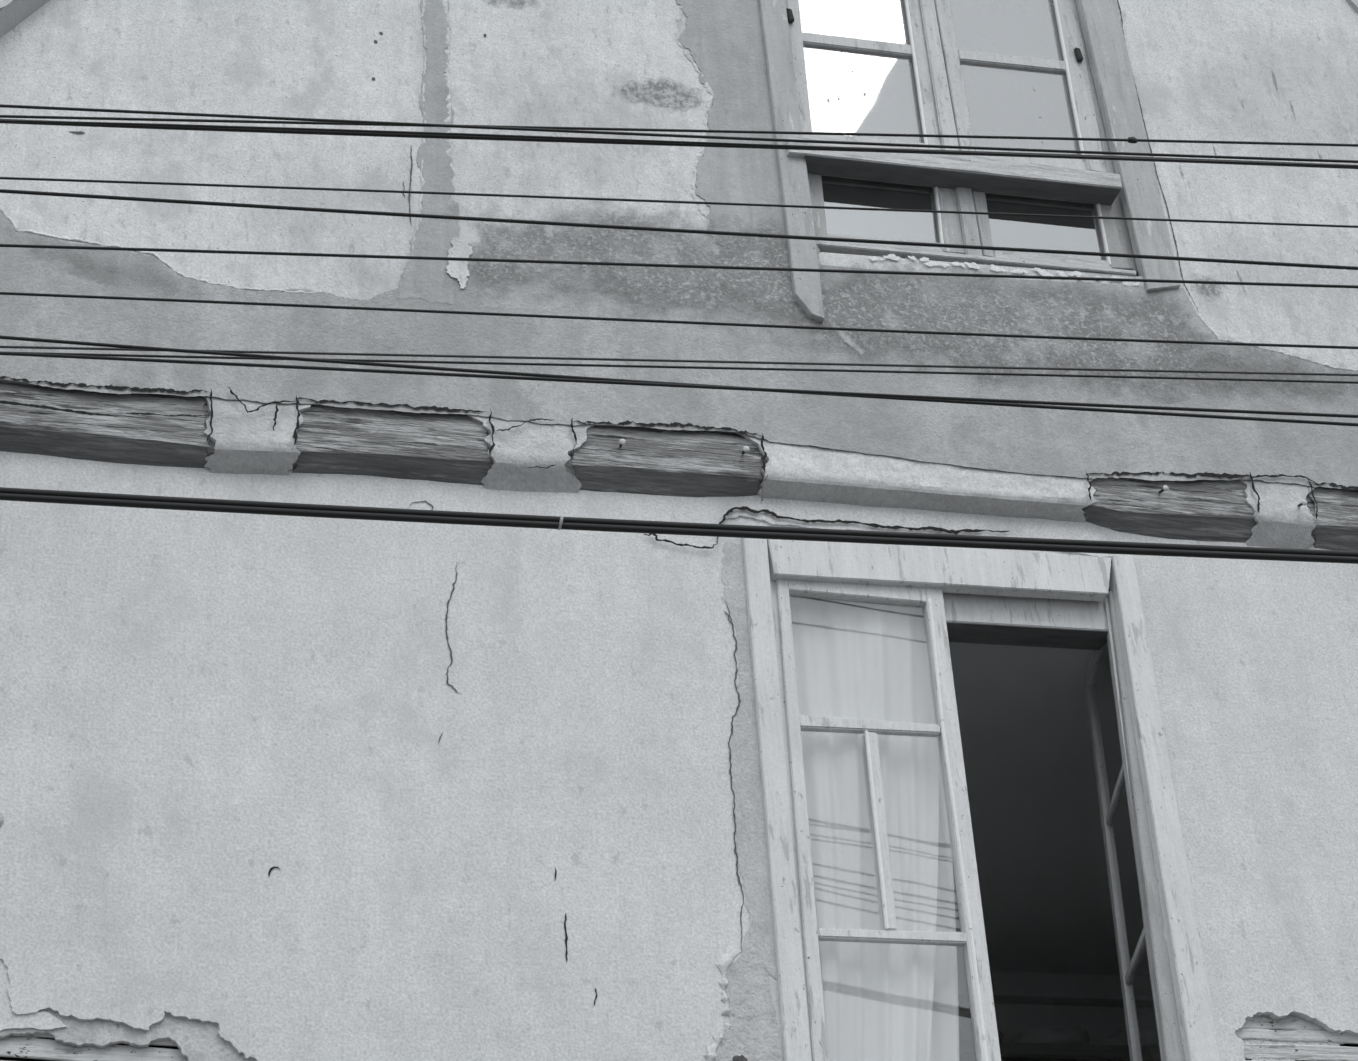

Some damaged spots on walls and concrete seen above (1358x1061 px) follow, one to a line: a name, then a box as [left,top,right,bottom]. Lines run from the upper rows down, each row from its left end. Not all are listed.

crack [1134,81,1199,312]
peeling [0,0,1358,551]
crack [644,475,1009,549]
crack [445,565,462,695]
crack [724,600,744,950]
flaking render [0,959,188,1061]
flaking render [704,918,783,1061]
flaking render [1235,1015,1358,1061]